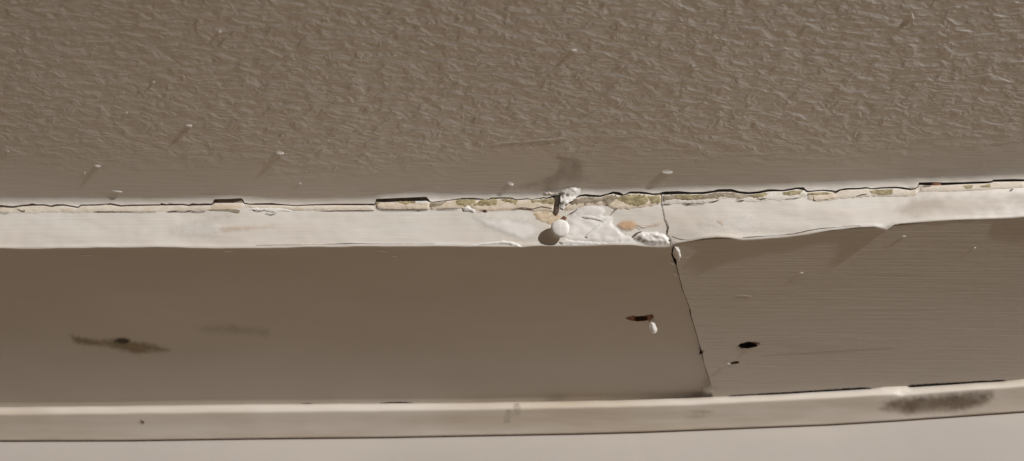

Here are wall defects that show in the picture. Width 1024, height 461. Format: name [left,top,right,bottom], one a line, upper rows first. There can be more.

peeling [0,182,1024,224]
peeling [633,231,670,245]
crack [0,179,1024,396]
damp [75,339,157,352]
damp [888,393,991,411]